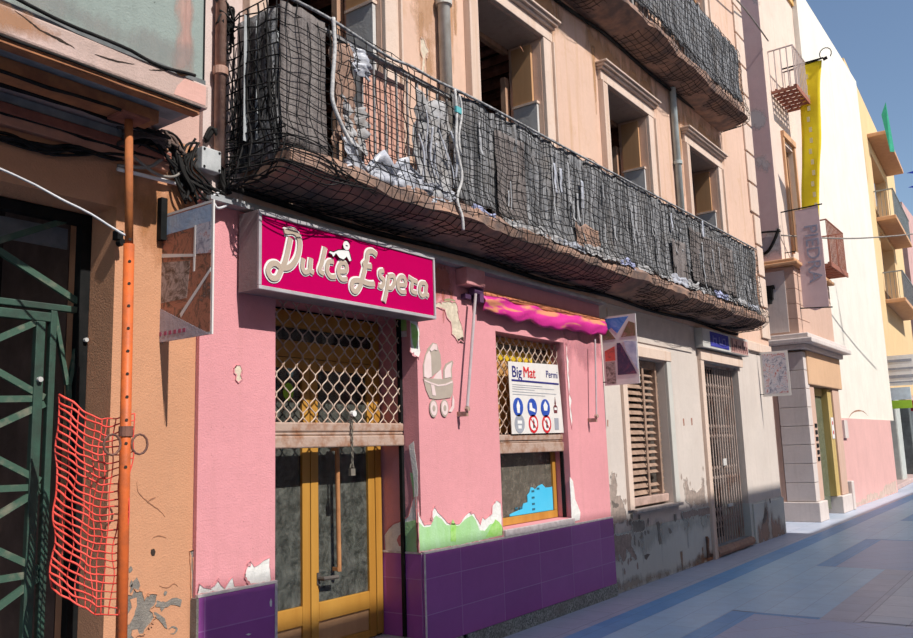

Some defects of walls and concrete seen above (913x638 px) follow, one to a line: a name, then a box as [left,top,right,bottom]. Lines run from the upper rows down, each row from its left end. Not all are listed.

crack [17,12,74,48]
peeling [436,298,465,343]
peeling [233,365,243,383]
peeling [565,343,573,428]
crack [137,487,166,538]
peeling [384,441,503,553]
peeling [570,478,580,521]
peeling [609,467,710,575]
peeling [127,550,272,638]